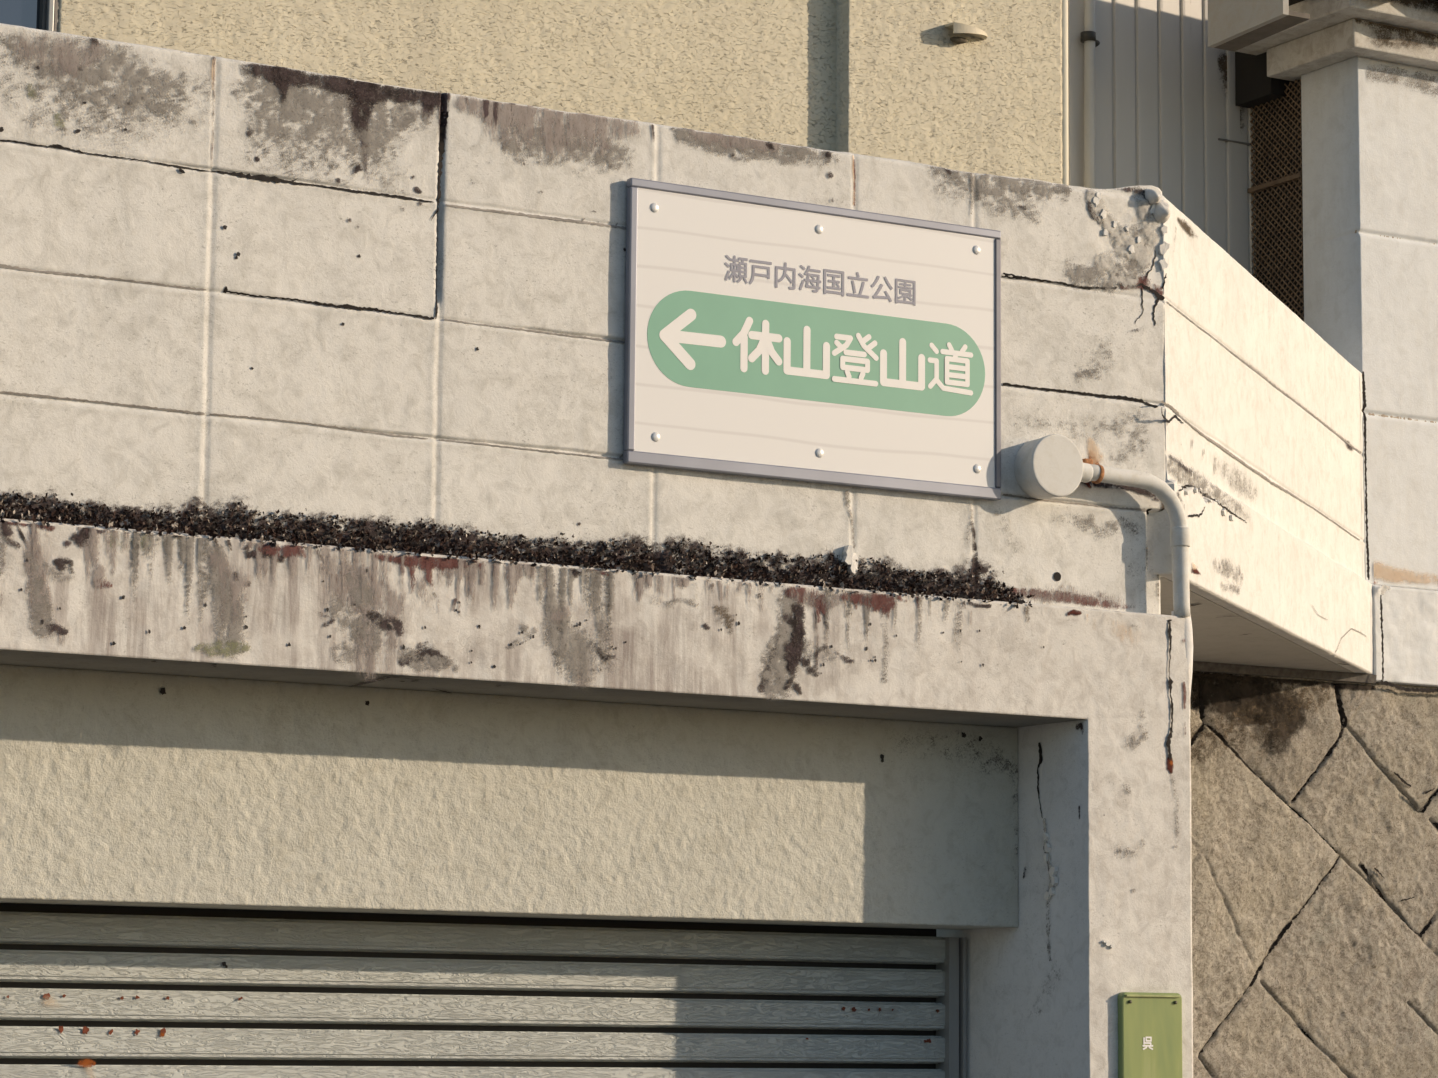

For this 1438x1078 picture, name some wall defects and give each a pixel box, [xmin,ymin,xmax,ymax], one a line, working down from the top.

leakage [0,32,211,141]
leakage [232,63,655,211]
leakage [671,127,838,178]
spalling [1065,186,1170,293]
rust [1088,439,1100,465]
leakage [0,521,627,706]
leakage [634,573,991,700]
leakage [966,510,981,584]
leakage [1012,585,1131,609]
leakage [1056,515,1138,536]
crack [1002,251,1438,1054]
leakage [1190,671,1376,762]